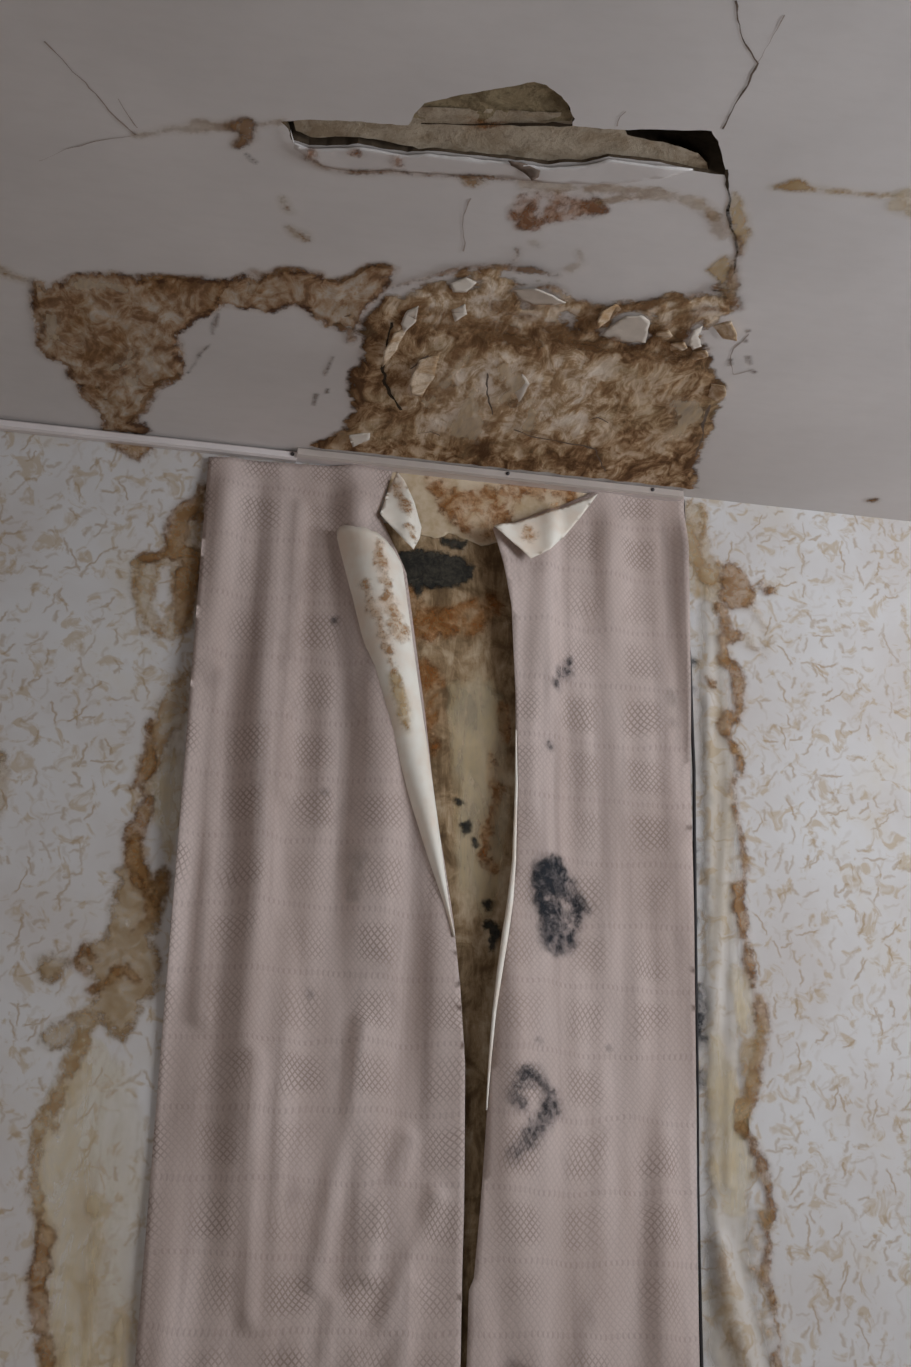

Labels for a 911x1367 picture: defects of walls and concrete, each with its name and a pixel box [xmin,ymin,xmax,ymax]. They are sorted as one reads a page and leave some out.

crack [40,41,138,161]
spalling [285,82,718,184]
crack [725,169,738,274]
crack [722,0,785,129]
leakage [774,179,815,191]
peeling [310,248,742,489]
leakage [130,484,207,638]
leakage [398,537,474,597]
leakage [533,854,589,955]
leakage [686,501,783,1367]
leakage [25,672,190,1367]
leakage [513,1067,559,1156]